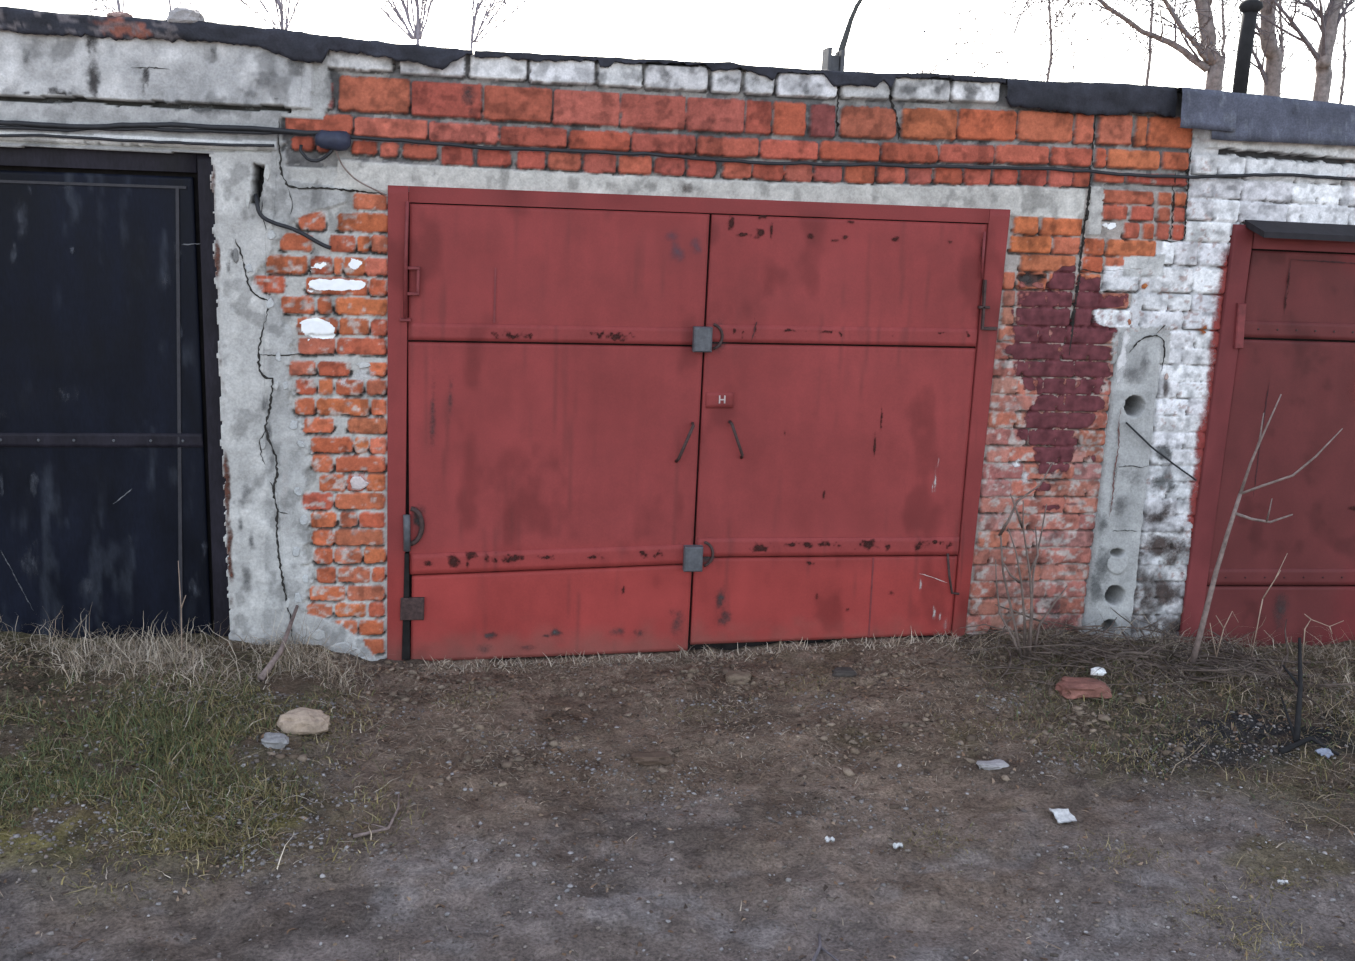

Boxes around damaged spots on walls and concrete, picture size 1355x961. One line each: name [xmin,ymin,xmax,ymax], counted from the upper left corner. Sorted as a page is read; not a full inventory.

crack [1069,115,1101,355]
crack [233,123,382,643]
peeling [1005,263,1148,511]
flaking render [307,629,373,661]